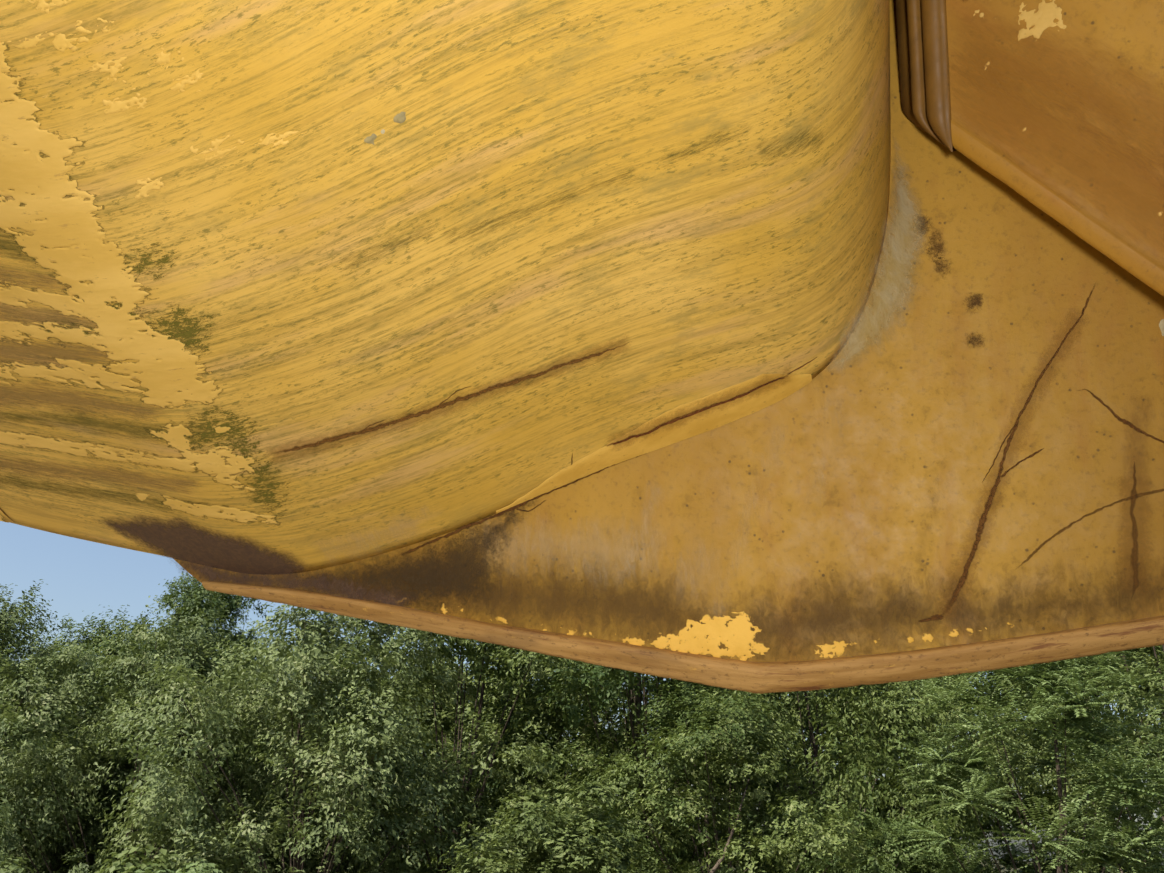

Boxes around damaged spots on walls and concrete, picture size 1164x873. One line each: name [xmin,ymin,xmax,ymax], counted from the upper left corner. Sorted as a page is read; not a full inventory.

peeling [1018,0,1066,41]
peeling [0,18,222,408]
leakage [0,339,108,364]
leakage [0,385,168,439]
crack [284,344,625,452]
peeling [0,424,256,491]
crack [404,357,817,554]
crack [919,291,1092,622]
leakage [0,458,706,639]
crack [1024,489,1164,562]
peeling [615,611,770,661]
leakage [749,593,934,650]